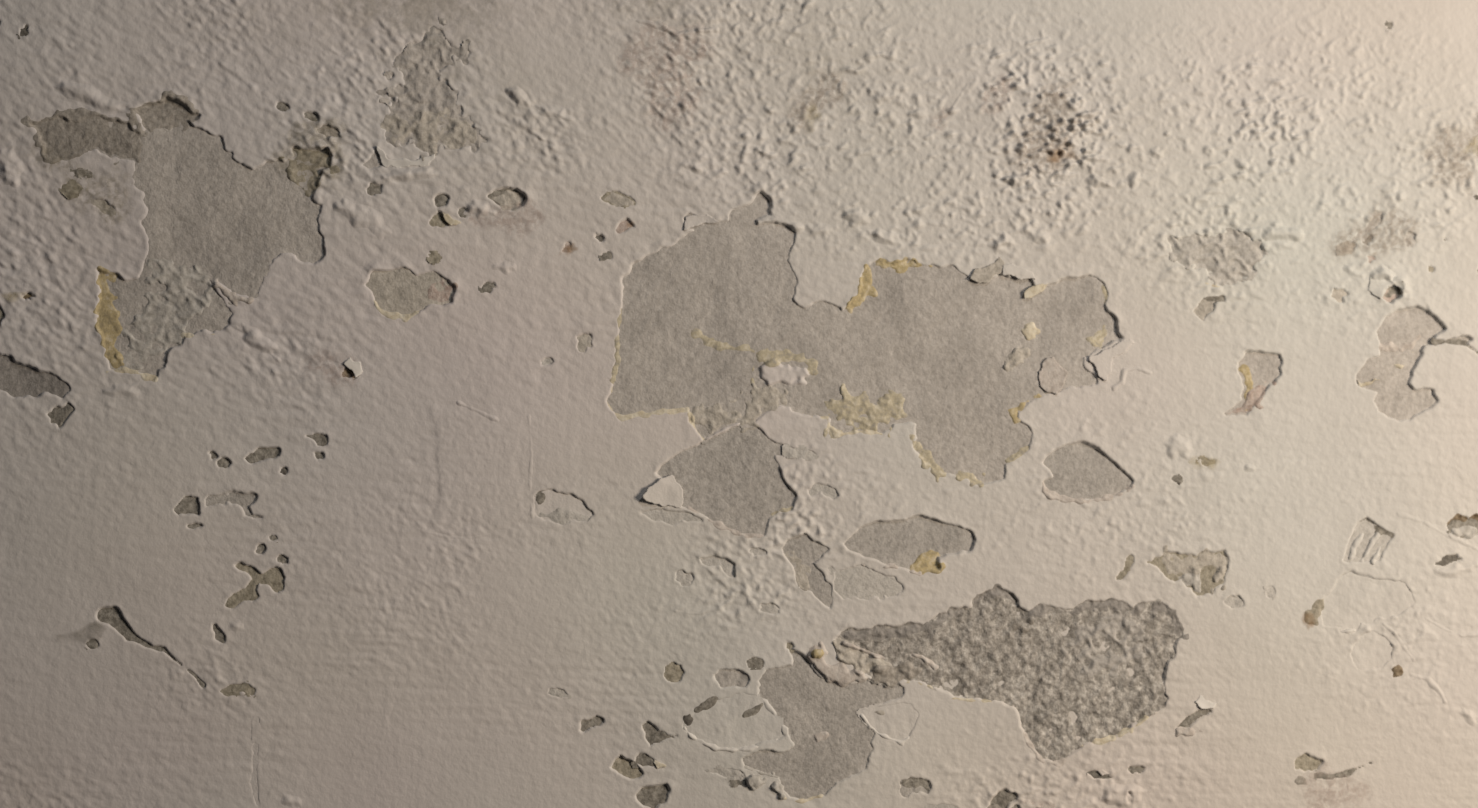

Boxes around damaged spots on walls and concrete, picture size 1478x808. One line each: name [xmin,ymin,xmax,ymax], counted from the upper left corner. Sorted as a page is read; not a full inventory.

peeling [21,90,340,382]
peeling [366,251,458,322]
peeling [1335,211,1469,420]
peeling [0,355,74,428]
peeling [607,193,1135,607]
peeling [1224,352,1281,416]
peeling [210,447,287,475]
peeling [174,492,262,529]
peeling [225,535,288,608]
peeling [1116,545,1244,608]
peeling [705,584,1189,804]
peeling [612,722,677,808]